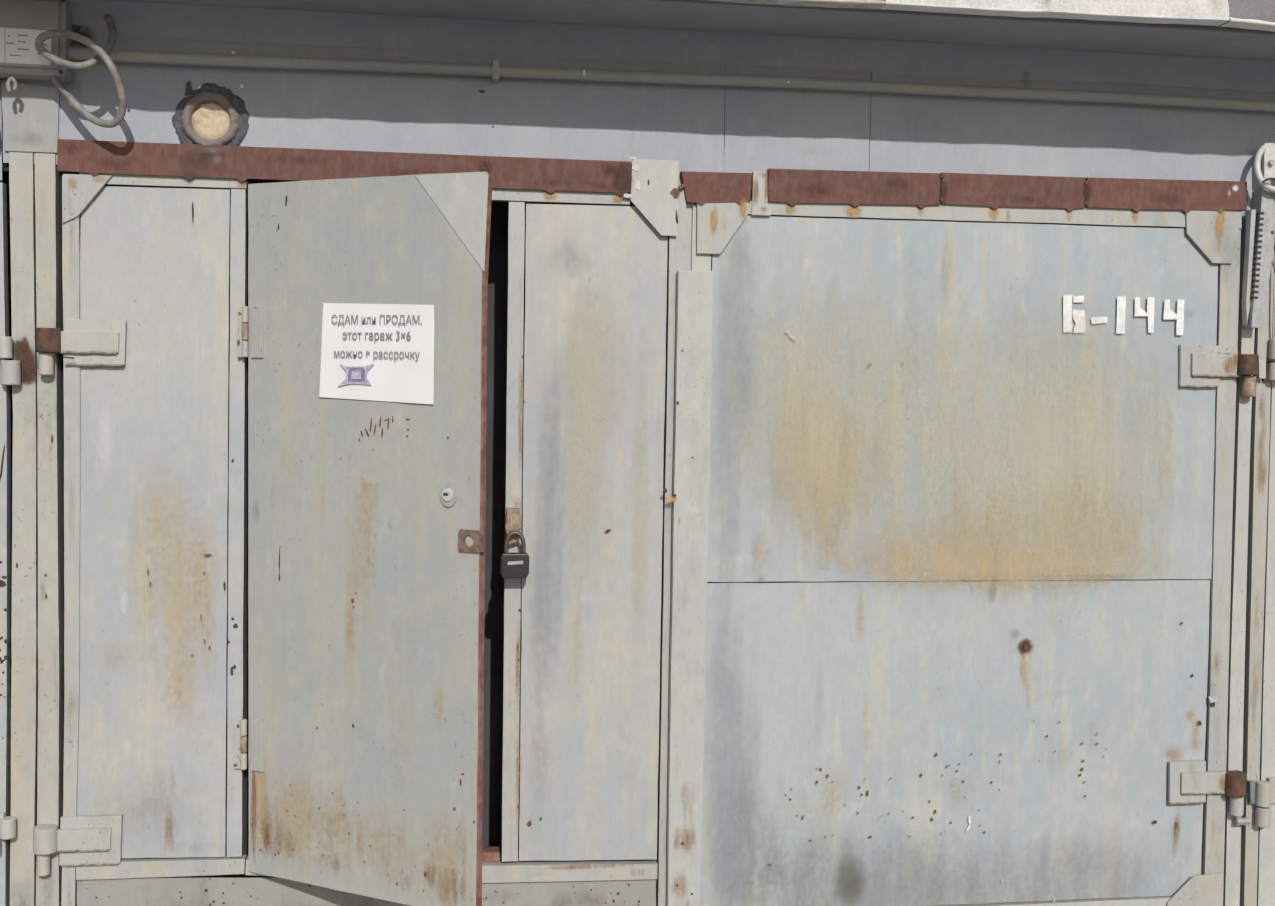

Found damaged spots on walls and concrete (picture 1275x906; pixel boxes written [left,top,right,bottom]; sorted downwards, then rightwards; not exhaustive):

rust [607,166,630,201]
rust [1020,639,1032,670]